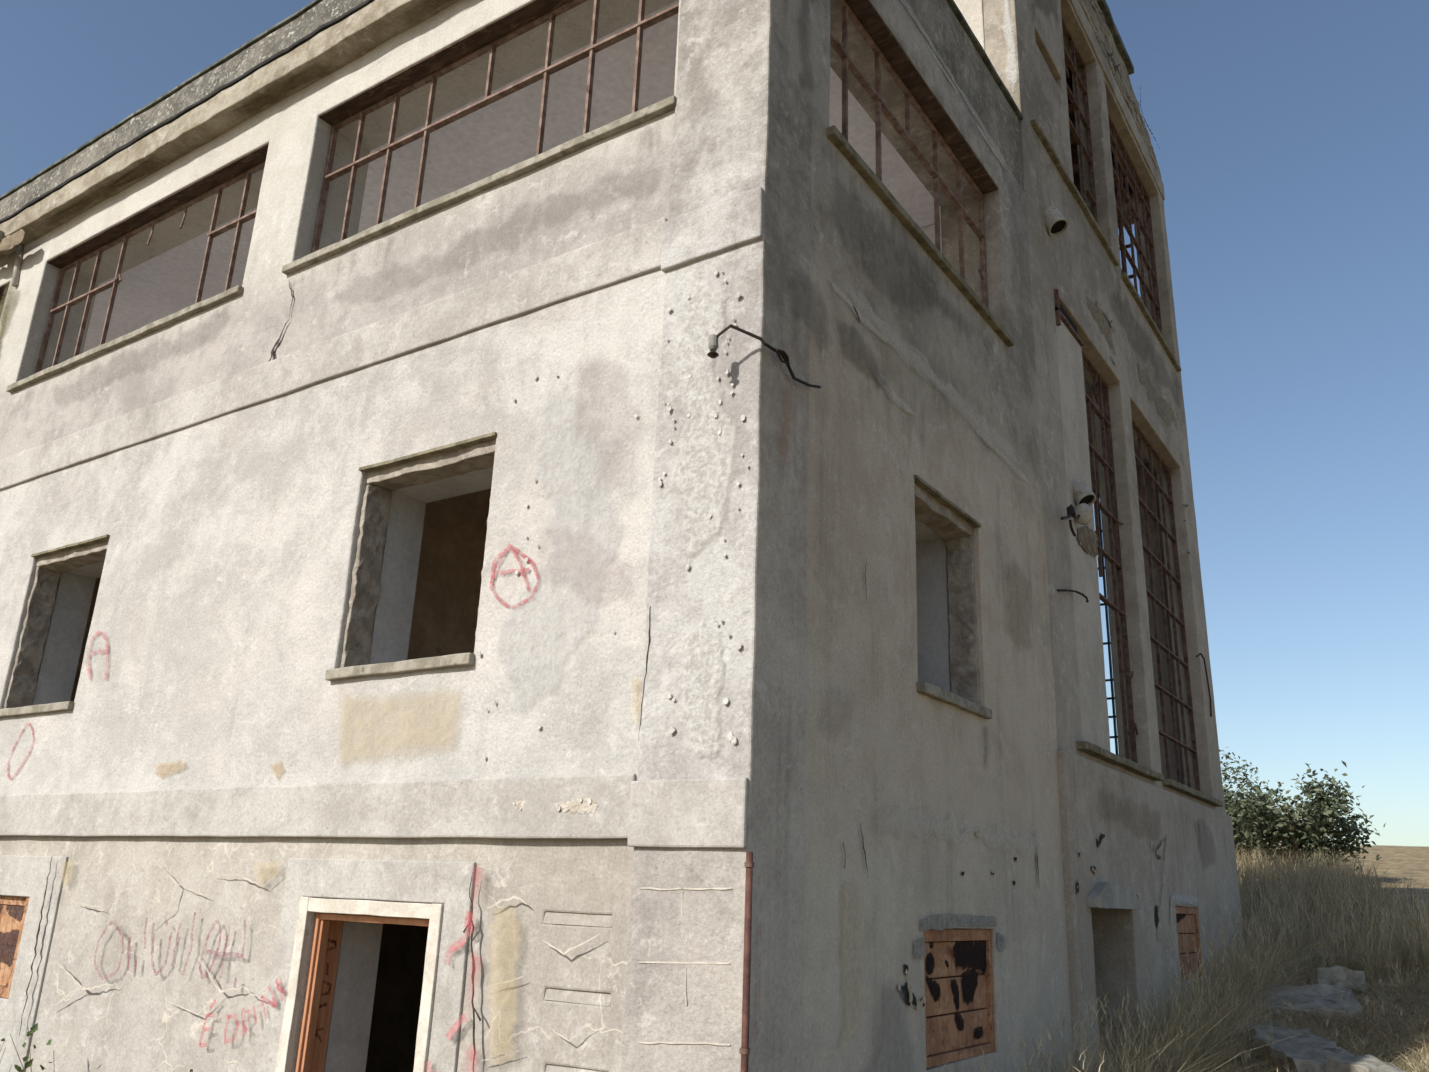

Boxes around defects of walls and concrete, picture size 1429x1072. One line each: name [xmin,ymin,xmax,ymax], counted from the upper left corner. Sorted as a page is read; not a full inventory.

crack [268,282,293,362]
crack [639,606,651,730]
spalling [898,964,926,1011]